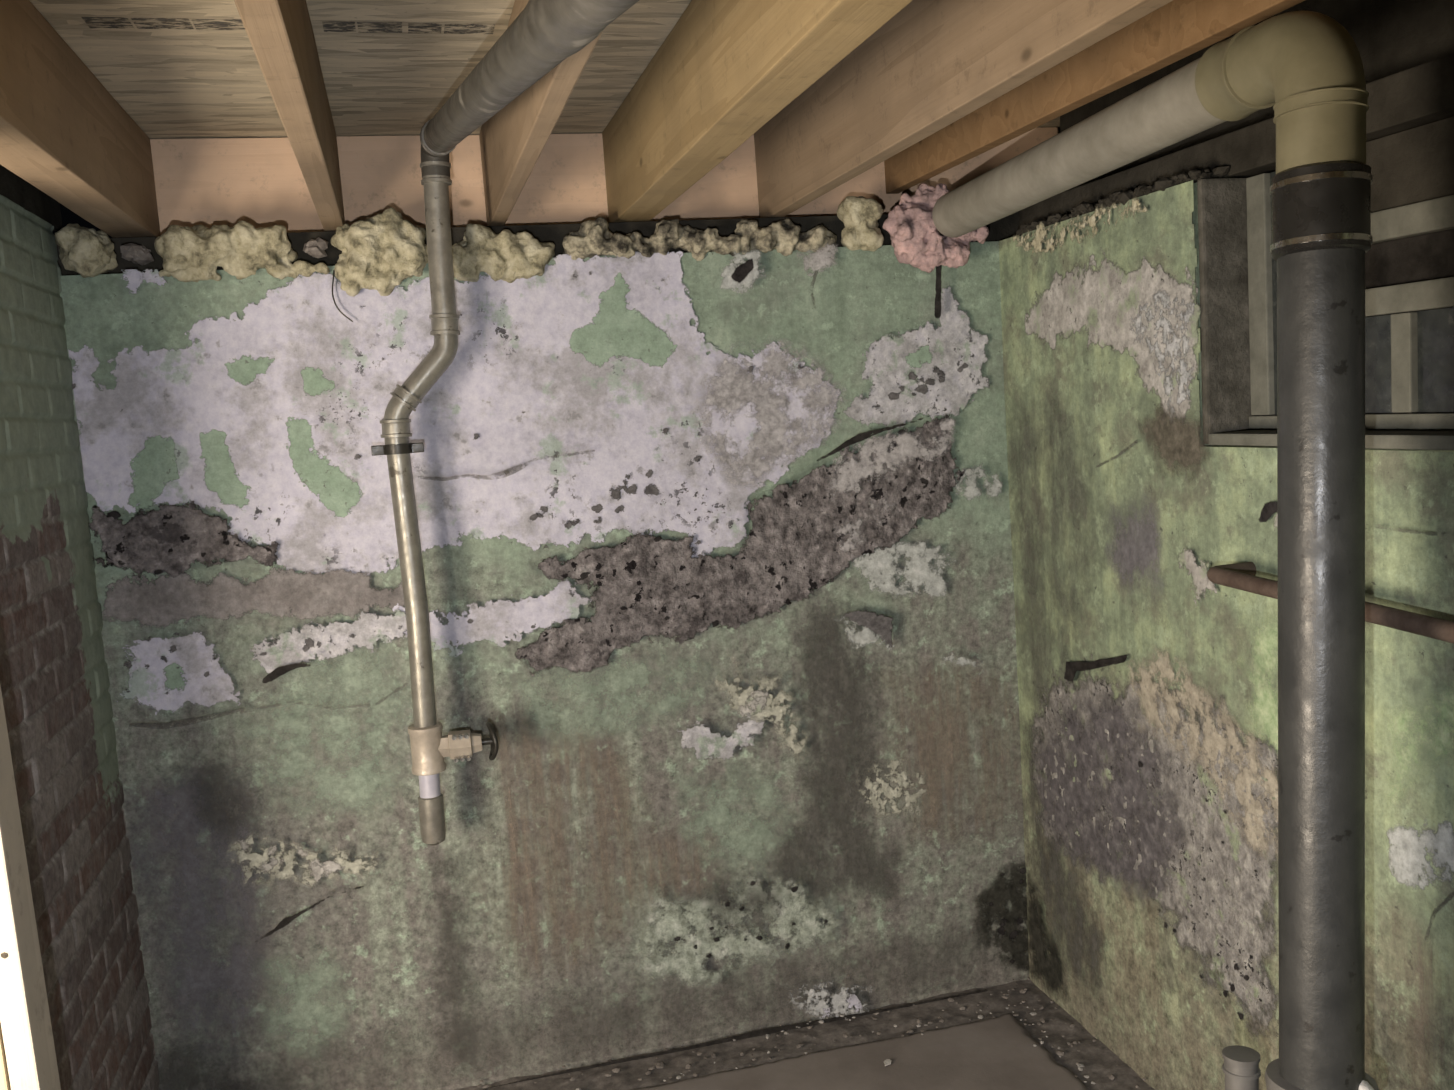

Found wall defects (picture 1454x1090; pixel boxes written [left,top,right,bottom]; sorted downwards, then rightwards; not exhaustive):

peeling [68,269,434,716]
peeling [409,250,1002,678]
crack [817,409,946,461]
peeling [1024,253,1201,423]
crack [255,886,363,942]
damp [636,612,927,986]
damp [976,729,1102,1000]
flaking render [1031,652,1278,1037]
peeling [1387,822,1454,890]